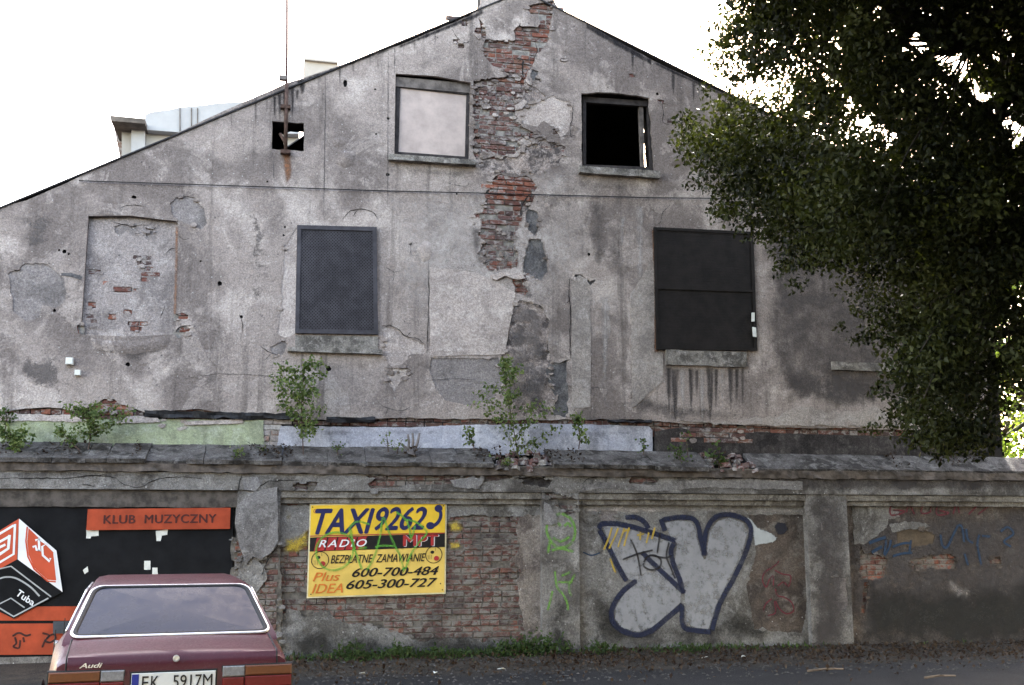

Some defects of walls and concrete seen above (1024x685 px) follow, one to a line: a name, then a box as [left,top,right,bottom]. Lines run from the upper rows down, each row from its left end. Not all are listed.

corrosion [283,155,291,181]
flaking render [114,222,156,238]
flaking render [170,194,207,229]
flaking render [256,2,913,458]
flaking render [8,255,160,321]
flaking render [77,302,148,335]
flaking render [173,313,194,338]
water stain [640,368,743,416]
flaking render [229,475,807,658]
flaking render [851,506,959,613]